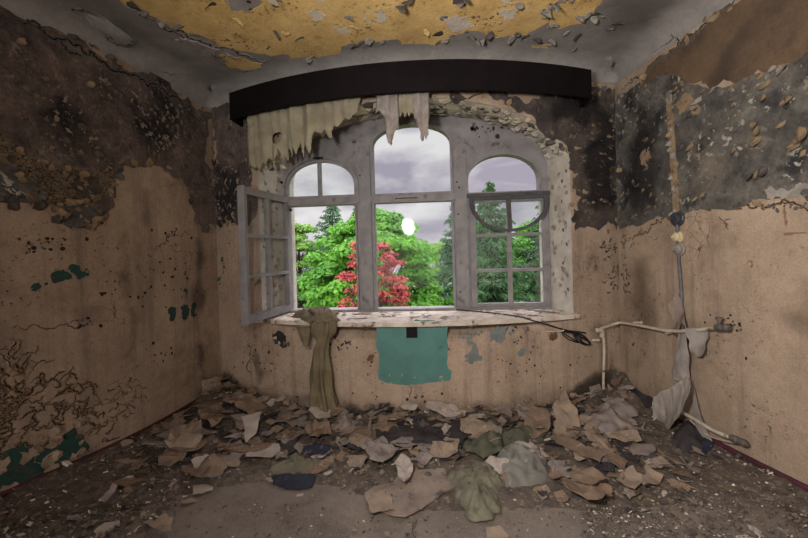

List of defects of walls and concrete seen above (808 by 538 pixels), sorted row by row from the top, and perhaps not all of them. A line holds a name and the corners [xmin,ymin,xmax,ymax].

peeling [120,0,623,73]
peeling [0,5,301,241]
peeling [341,102,385,125]
peeling [429,0,808,255]
peeling [18,237,66,253]
peeling [159,257,197,322]
crack [0,318,147,460]
peeling [0,420,97,490]